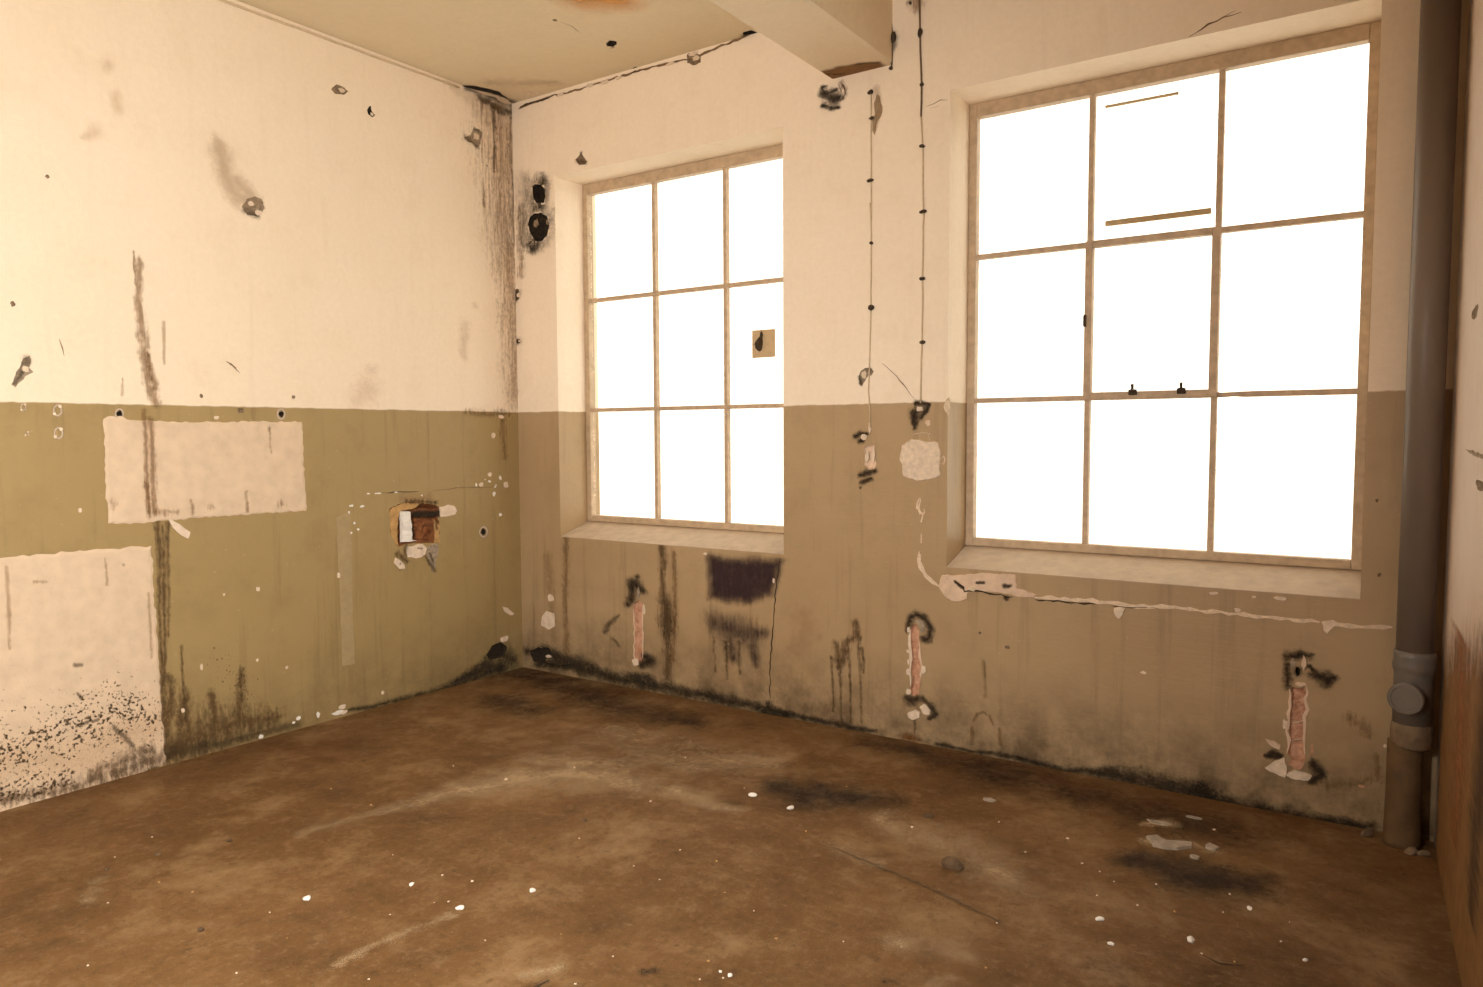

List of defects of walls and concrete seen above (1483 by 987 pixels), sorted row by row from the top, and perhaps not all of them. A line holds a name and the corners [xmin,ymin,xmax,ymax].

leakage [465,87,523,290]
leakage [0,257,279,807]
spalling [625,575,655,668]
spalling [904,612,938,733]
spalling [1264,651,1337,784]